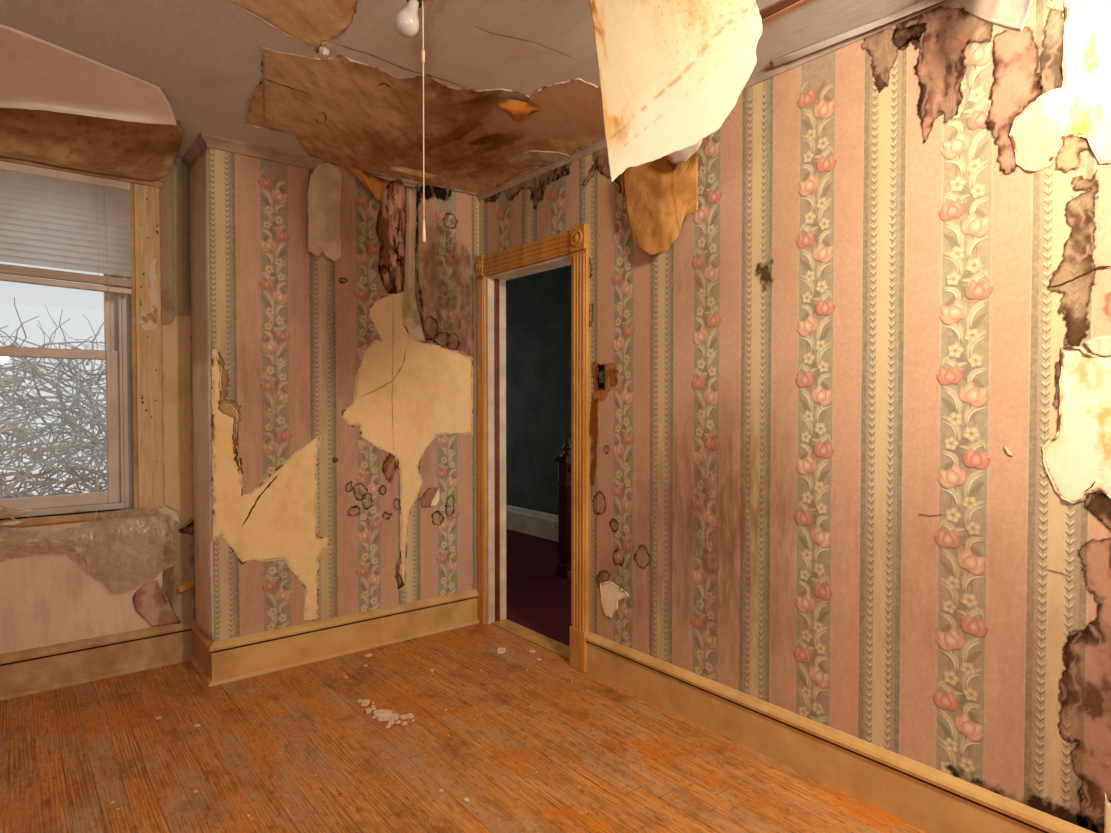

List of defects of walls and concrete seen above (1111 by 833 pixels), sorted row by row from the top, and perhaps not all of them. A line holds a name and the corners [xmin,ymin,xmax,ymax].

flaking render [0,108,183,181]
flaking render [224,0,605,194]
flaking render [1009,0,1111,172]
flaking render [211,348,329,621]
flaking render [342,292,473,590]
flaking render [1042,346,1111,504]
spalling [133,580,180,626]
flaking render [596,570,629,619]
damp [1028,481,1111,833]
damp [948,765,1006,797]